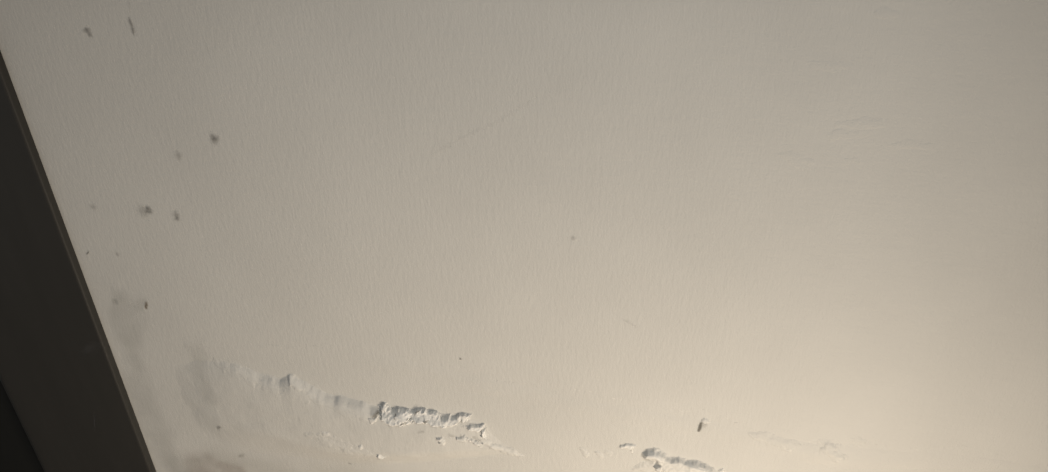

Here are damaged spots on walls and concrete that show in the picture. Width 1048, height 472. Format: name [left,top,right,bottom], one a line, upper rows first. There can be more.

peeling [617,443,725,472]